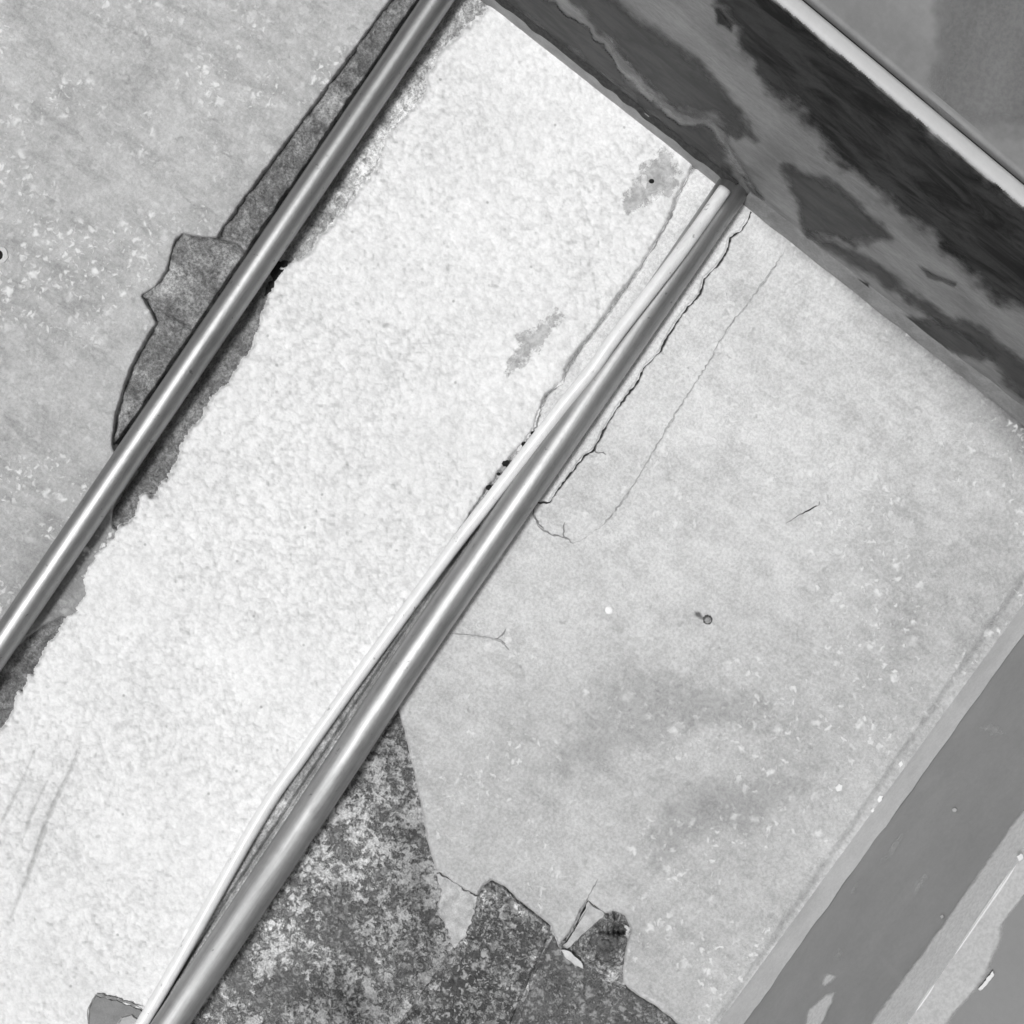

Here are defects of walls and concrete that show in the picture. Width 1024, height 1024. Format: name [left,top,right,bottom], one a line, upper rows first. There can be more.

spalling [112,0,486,528]
crack [485,168,692,490]
water stain [507,0,762,199]
crack [532,211,785,543]
water stain [715,0,1024,306]
water stain [782,165,1024,399]
spalling [191,712,677,1024]